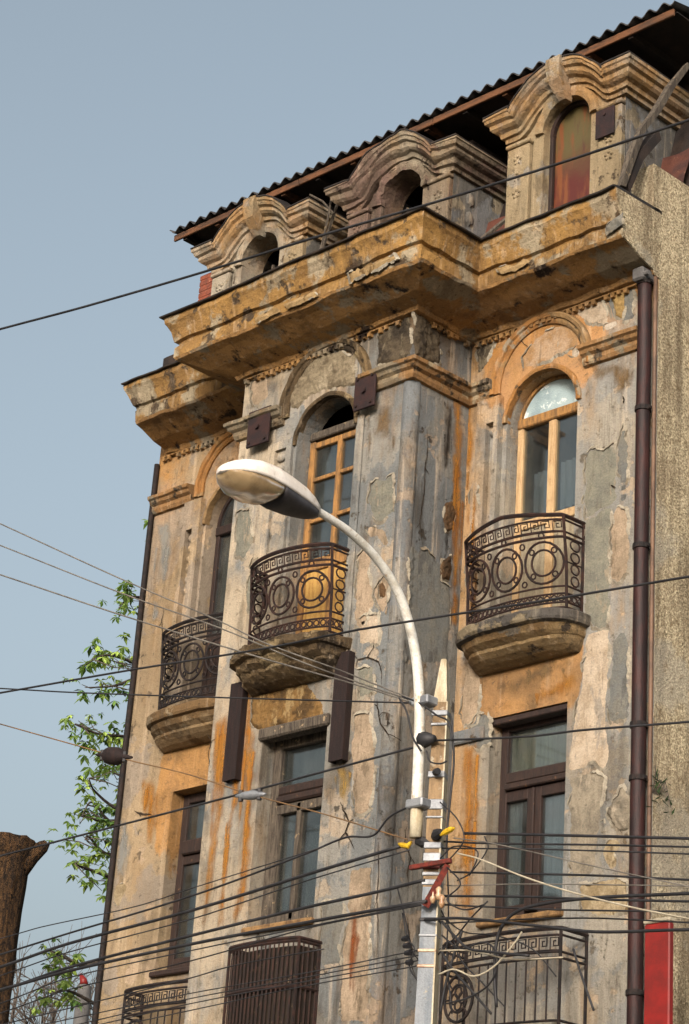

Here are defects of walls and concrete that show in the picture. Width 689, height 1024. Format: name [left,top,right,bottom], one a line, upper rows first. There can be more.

peeling [347,252,400,284]
peeling [496,259,530,274]
peeling [578,288,638,331]
peeling [365,472,396,545]
crack [416,433,428,545]
corrosion [452,403,477,623]
crack [355,645,401,741]
peeling [567,423,632,921]
corrosion [206,696,255,914]
crack [338,802,354,848]
corrosion [462,749,479,915]
corrosion [349,919,358,977]